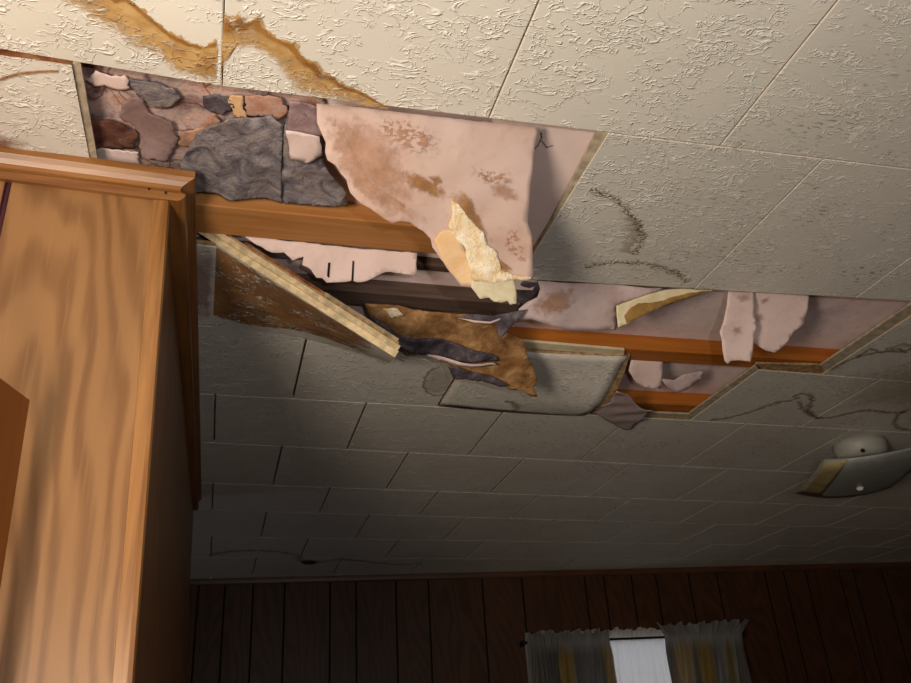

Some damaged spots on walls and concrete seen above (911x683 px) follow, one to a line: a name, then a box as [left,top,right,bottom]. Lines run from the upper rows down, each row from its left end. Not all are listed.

leakage [0,70,58,81]
flaking render [86,70,293,164]
leakage [71,0,389,109]
flaking render [286,130,323,164]